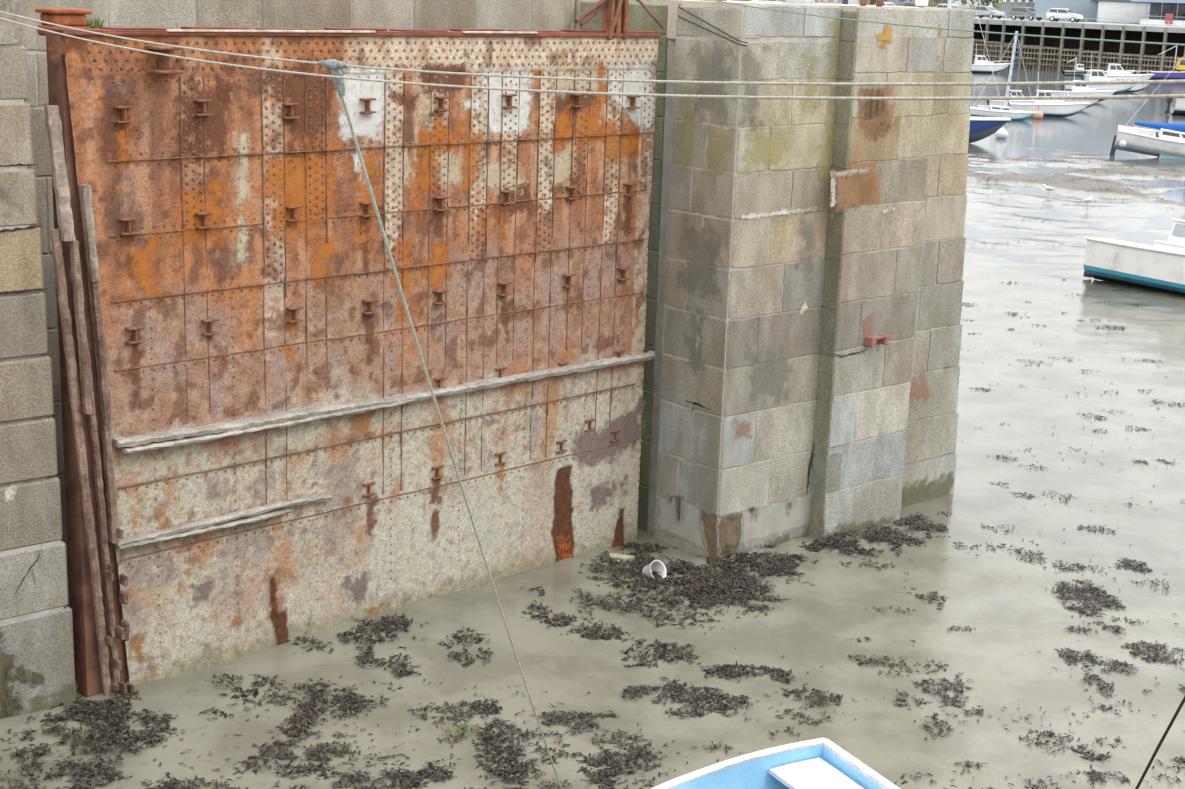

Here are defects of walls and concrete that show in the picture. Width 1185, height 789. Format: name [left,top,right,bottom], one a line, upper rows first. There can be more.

rust [172,61,244,161]
rust [394,62,466,111]
rust [551,61,653,162]
rust [858,86,895,141]
rust [257,55,343,285]
rust [120,177,228,307]
rust [390,111,484,320]
rust [349,410,377,441]
rust [366,495,379,535]
rust [429,478,443,538]
crack [15,545,42,595]
leakage [0,632,44,719]